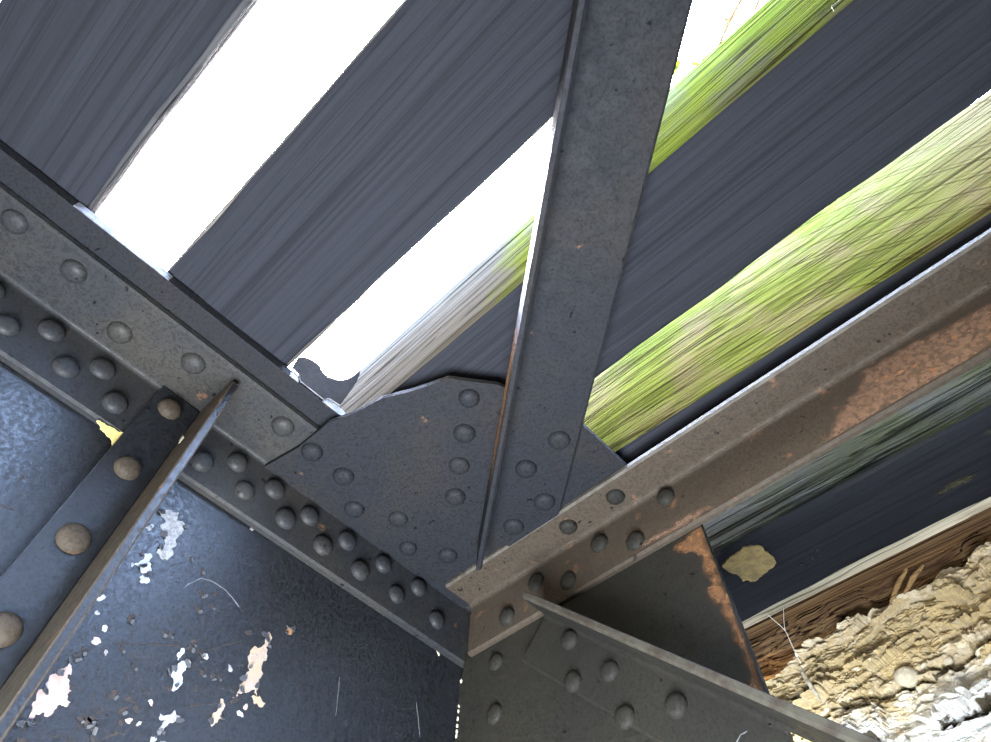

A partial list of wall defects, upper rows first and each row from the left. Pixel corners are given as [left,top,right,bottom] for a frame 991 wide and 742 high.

rust [826,303,991,442]
peeling [135,509,188,584]
rust [641,506,760,690]
peeling [16,656,73,728]
peeling [150,710,185,742]
peeling [167,648,193,691]
peeling [208,631,272,727]